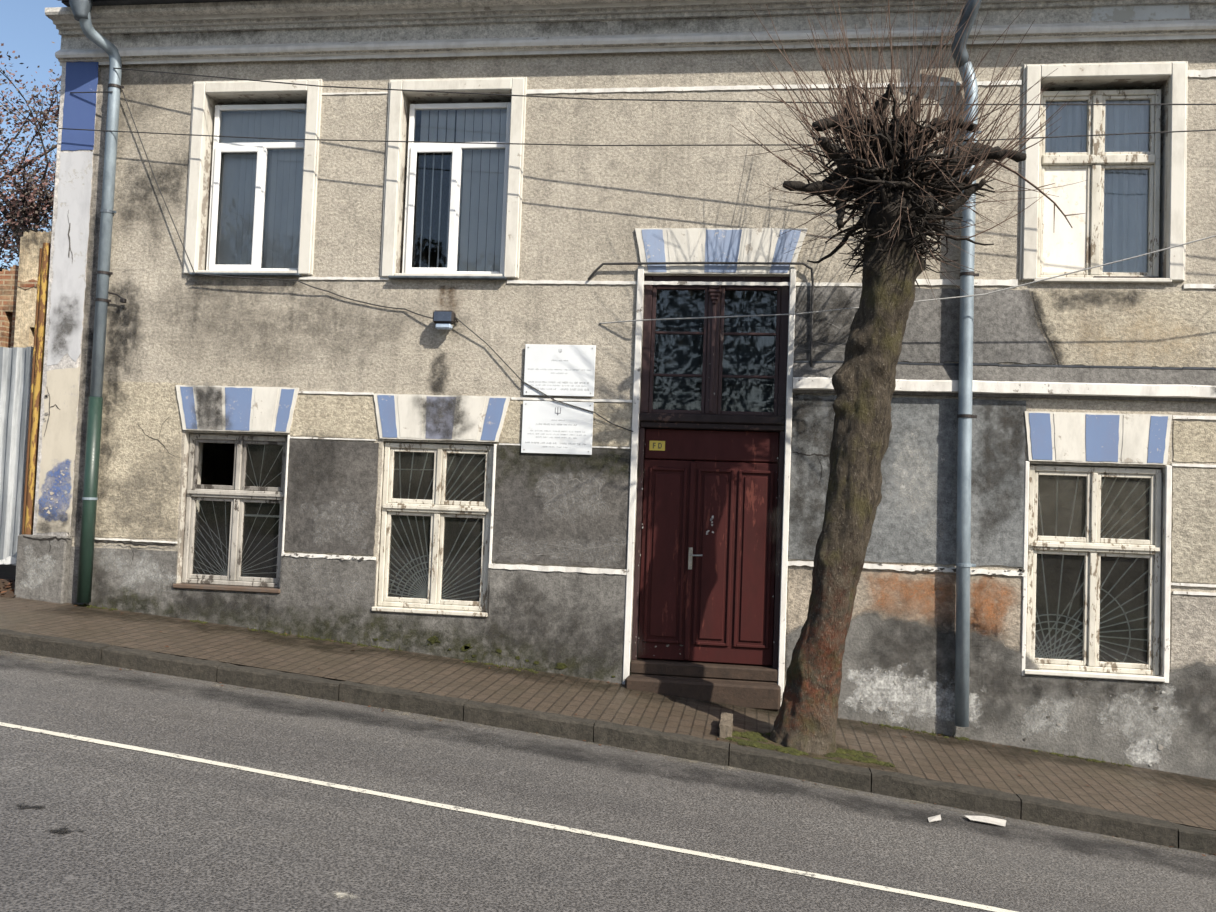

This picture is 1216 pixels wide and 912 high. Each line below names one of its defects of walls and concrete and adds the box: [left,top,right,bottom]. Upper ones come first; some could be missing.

crack [66,210,74,262]
leakage [53,216,136,405]
leakage [1031,295,1062,365]
leakage [420,383,466,437]
peeling [39,460,71,521]
leakage [39,484,83,532]
leakage [874,619,953,690]